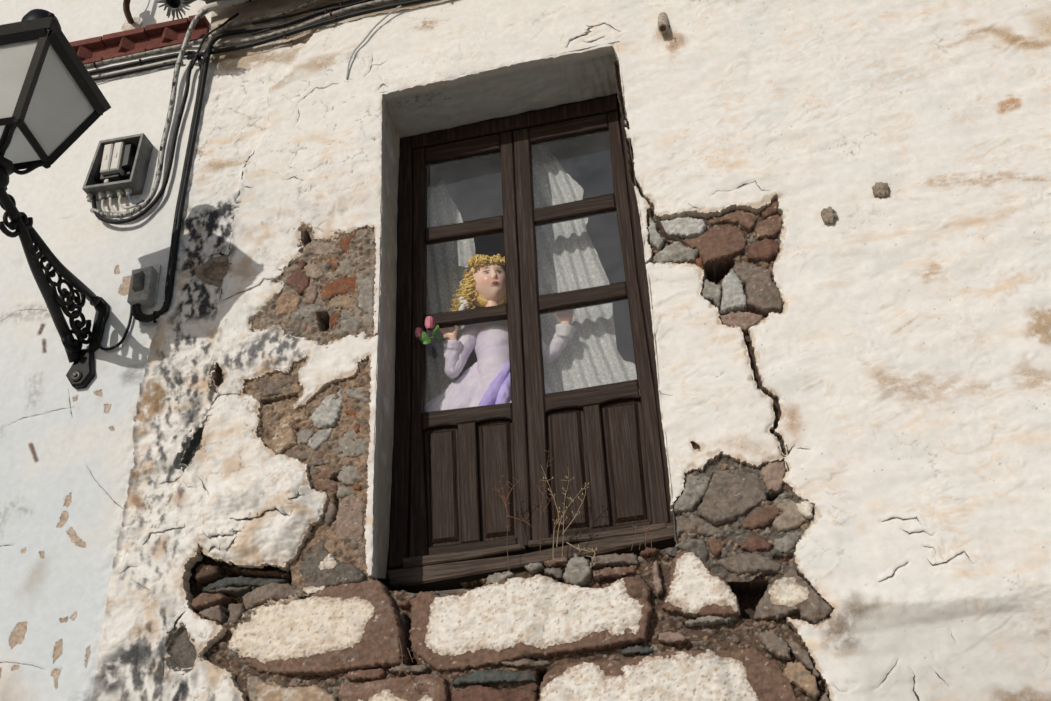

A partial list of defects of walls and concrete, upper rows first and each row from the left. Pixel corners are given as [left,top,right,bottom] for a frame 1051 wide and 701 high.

crack [564,20,622,47]
leakage [997,31,1044,47]
crack [613,60,691,247]
leakage [124,198,236,582]
spalling [195,256,232,286]
leakage [222,328,299,367]
spalling [248,223,381,349]
spalling [647,200,783,342]
crack [745,333,805,471]
spalling [163,354,833,701]
crack [876,511,977,582]